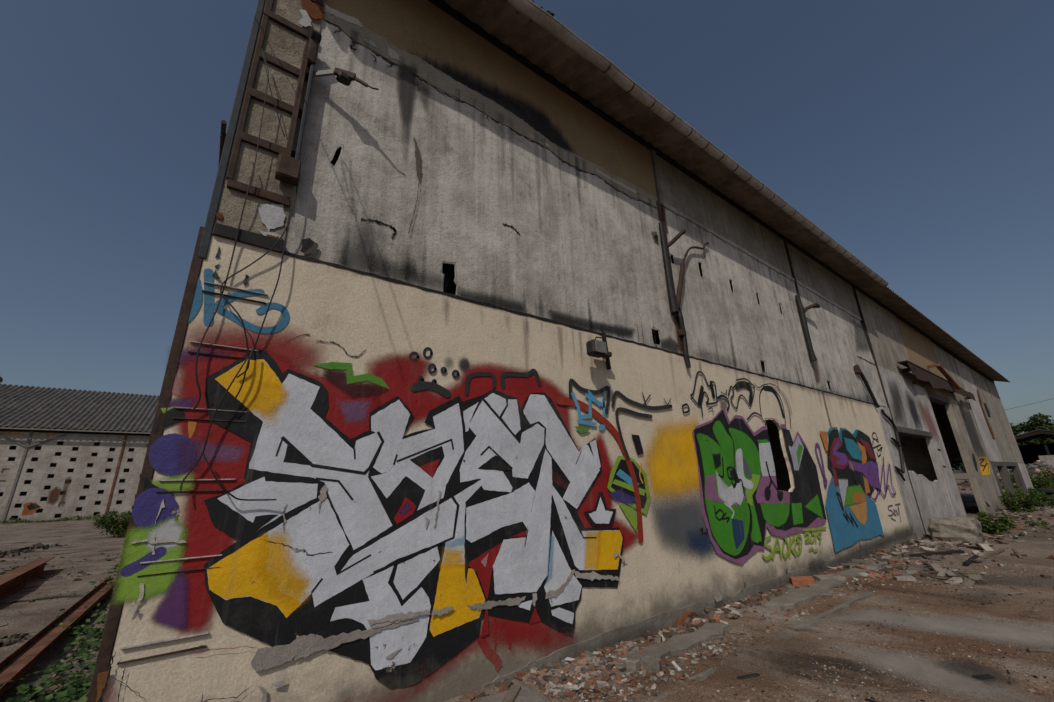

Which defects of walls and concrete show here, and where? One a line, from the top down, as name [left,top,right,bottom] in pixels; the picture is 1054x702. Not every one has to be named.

damp [399,65,416,135]
spalling [298,3,657,207]
crack [325,20,657,209]
damp [425,59,572,153]
peeling [258,204,286,240]
corrosion [656,201,668,233]
damp [459,289,524,311]
damp [551,311,633,337]
damp [662,339,678,353]
corrosion [674,314,683,350]
damp [892,387,920,426]